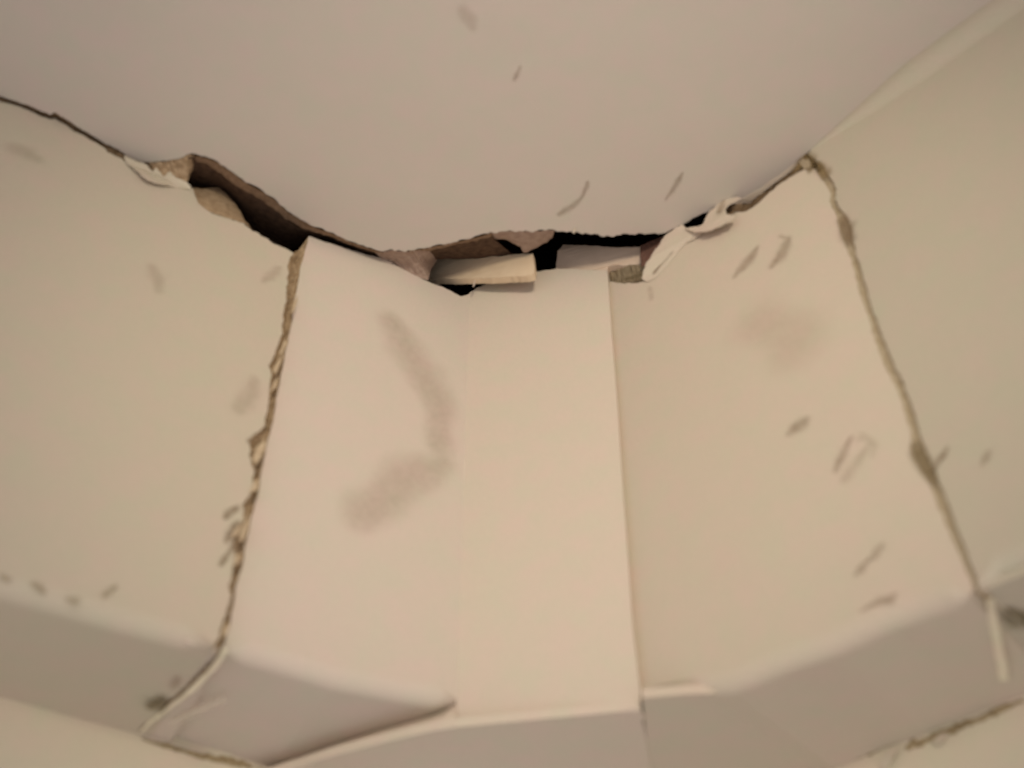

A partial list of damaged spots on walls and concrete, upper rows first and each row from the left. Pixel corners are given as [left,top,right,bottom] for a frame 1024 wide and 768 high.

crack [0,96,191,190]
spalling [149,153,336,235]
spalling [350,197,748,296]
crack [139,238,308,768]
crack [726,163,1024,768]